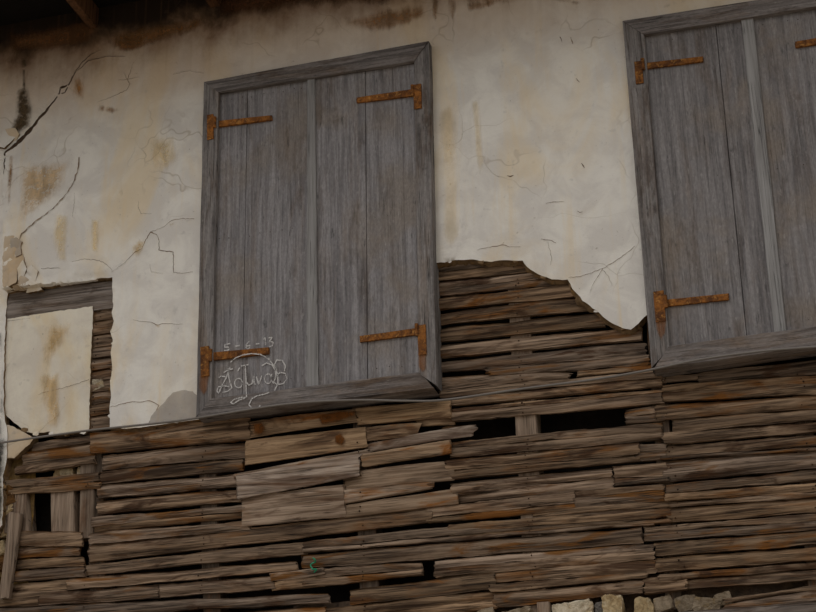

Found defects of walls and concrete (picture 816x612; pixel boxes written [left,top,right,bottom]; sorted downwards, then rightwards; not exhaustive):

water stain [115,21,199,50]
water stain [365,9,421,27]
water stain [14,60,30,131]
crack [0,49,126,175]
crack [41,201,195,275]
flaking render [437,260,641,334]
flaking render [8,418,91,439]
flaking render [110,390,197,432]
flaking render [0,476,9,536]